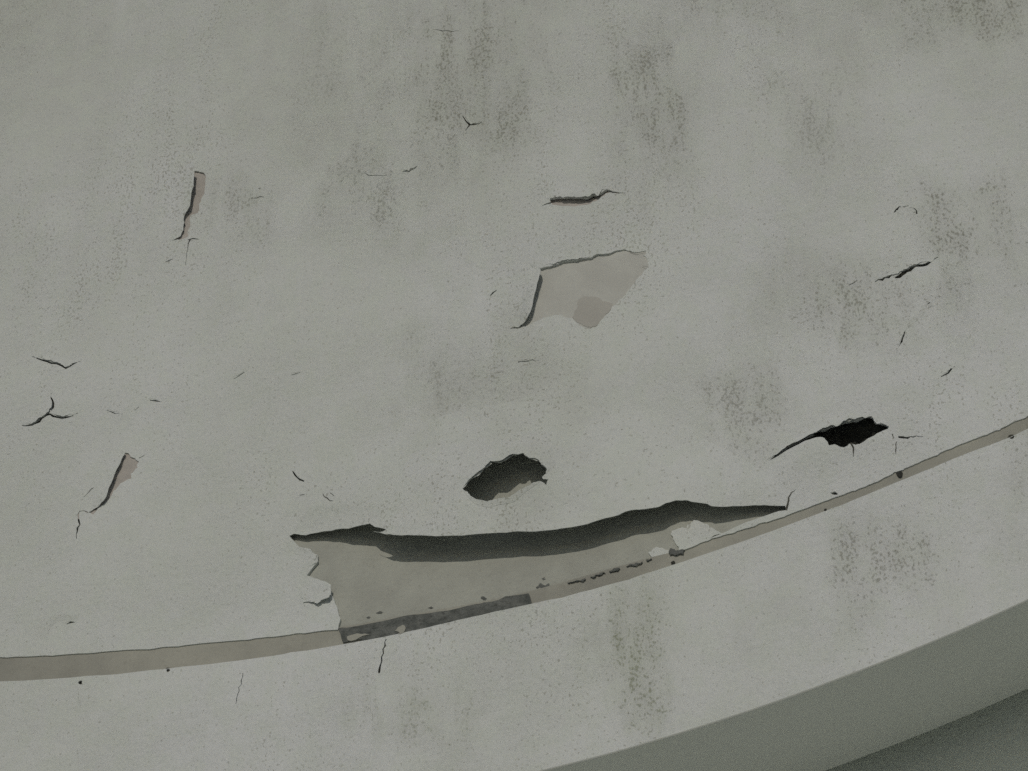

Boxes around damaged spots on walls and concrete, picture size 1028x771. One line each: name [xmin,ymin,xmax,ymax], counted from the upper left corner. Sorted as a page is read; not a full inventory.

peeling [166,163,206,246]
peeling [507,249,648,329]
crack [875,253,937,281]
crack [34,349,80,369]
crack [22,393,77,426]
peeling [77,448,138,532]
peeling [276,392,888,643]